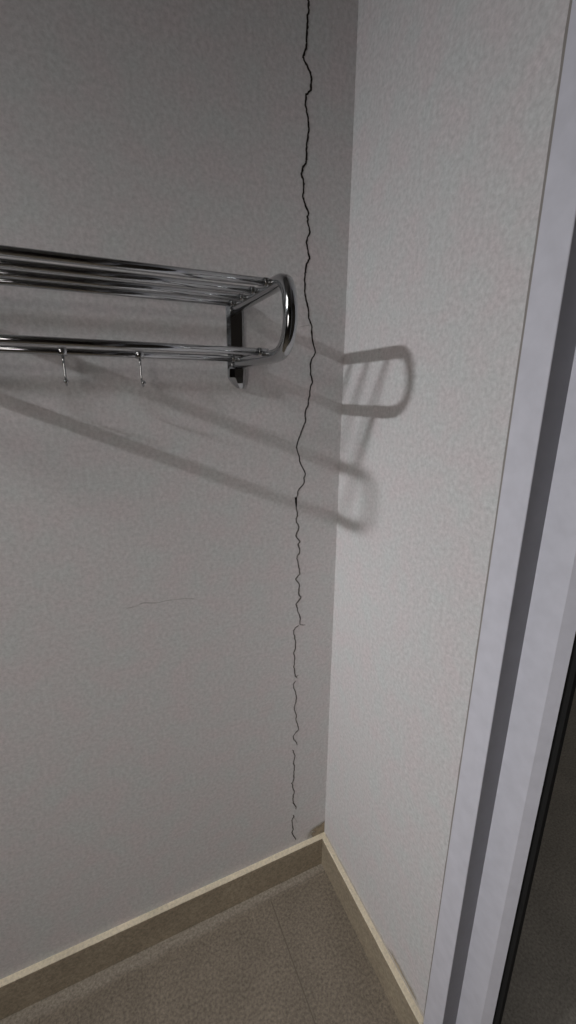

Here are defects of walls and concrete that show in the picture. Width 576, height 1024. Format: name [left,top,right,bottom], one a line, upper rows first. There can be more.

crack [291,0,316,840]